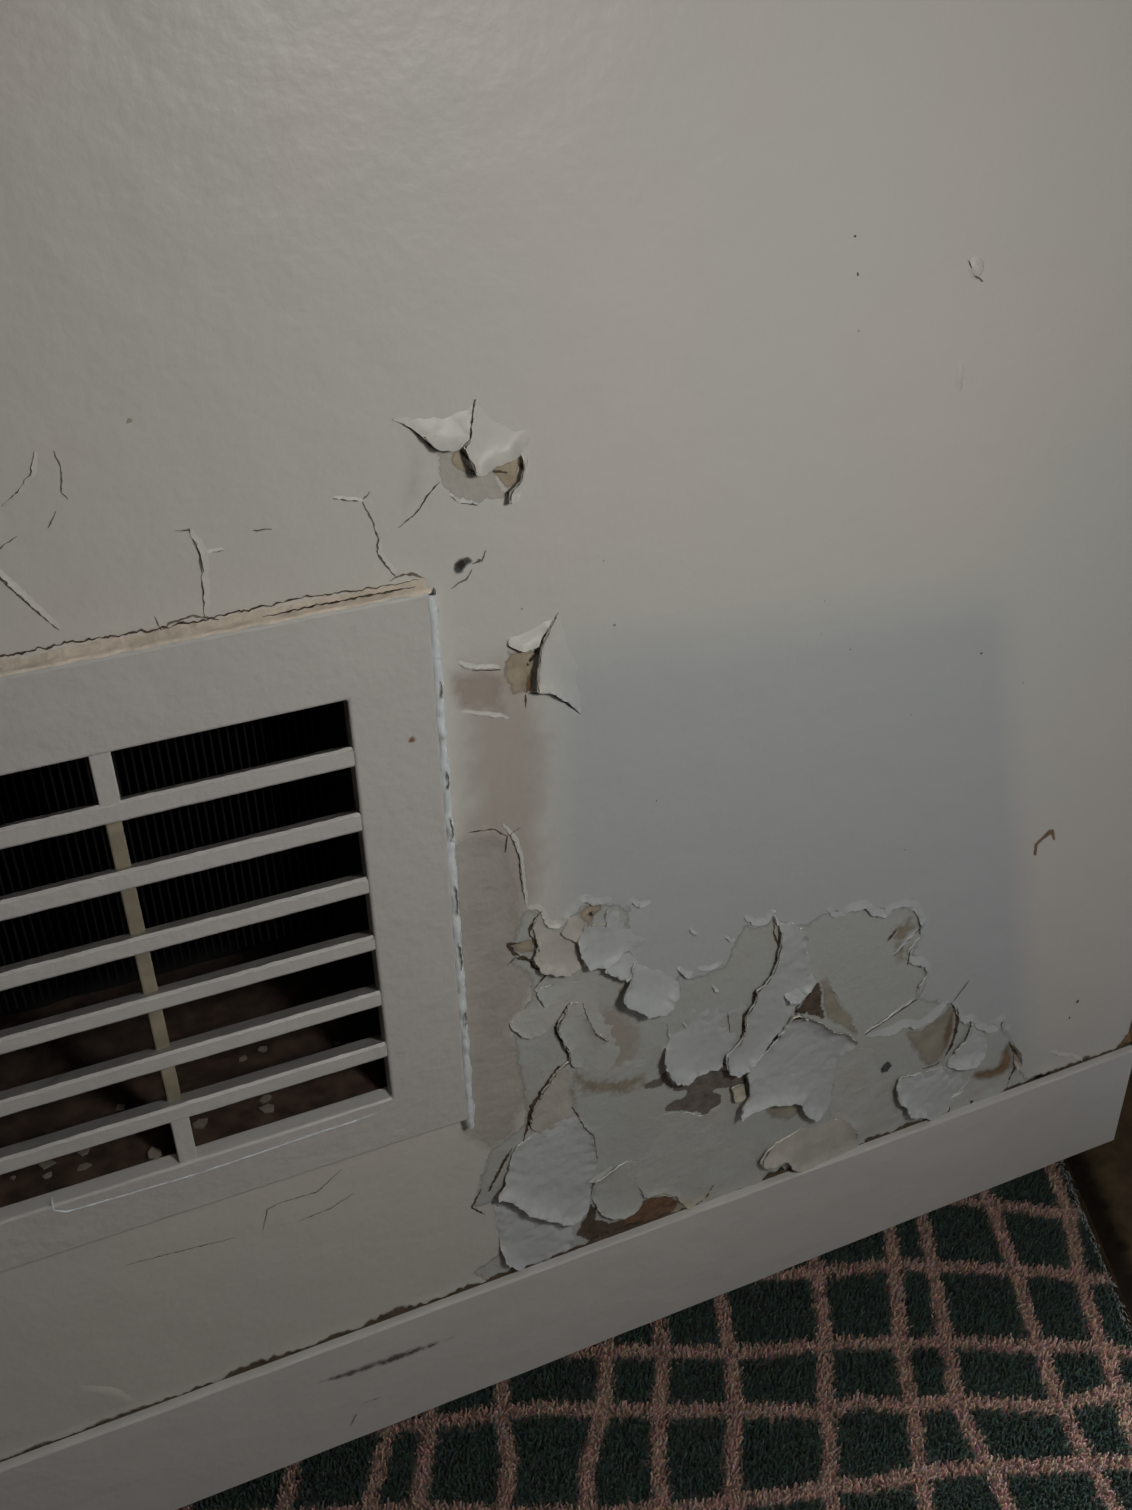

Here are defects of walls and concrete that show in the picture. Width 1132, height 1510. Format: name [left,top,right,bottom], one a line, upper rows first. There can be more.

peeling [392,399,529,528]
crack [0,450,68,630]
crack [154,528,272,630]
crack [333,491,486,588]
peeling [458,615,582,719]
peeling [455,823,1027,1280]